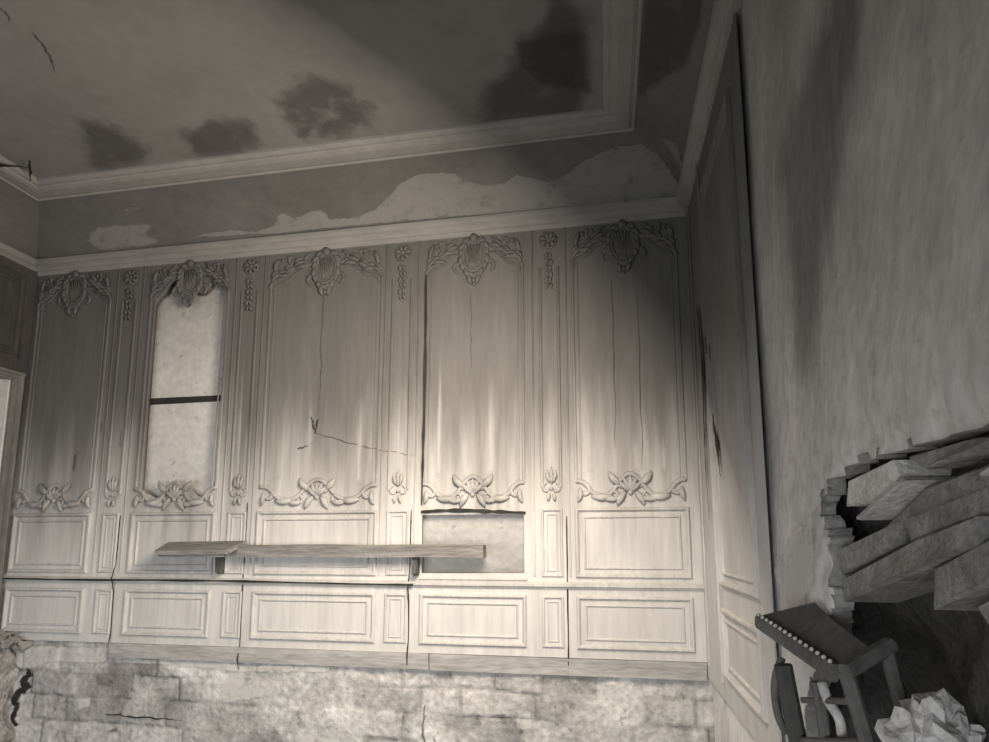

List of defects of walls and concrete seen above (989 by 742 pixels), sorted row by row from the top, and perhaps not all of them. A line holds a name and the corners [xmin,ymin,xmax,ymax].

peeling [197,144,678,237]
peeling [84,224,159,251]
spalling [774,518,814,610]
spalling [839,437,989,624]